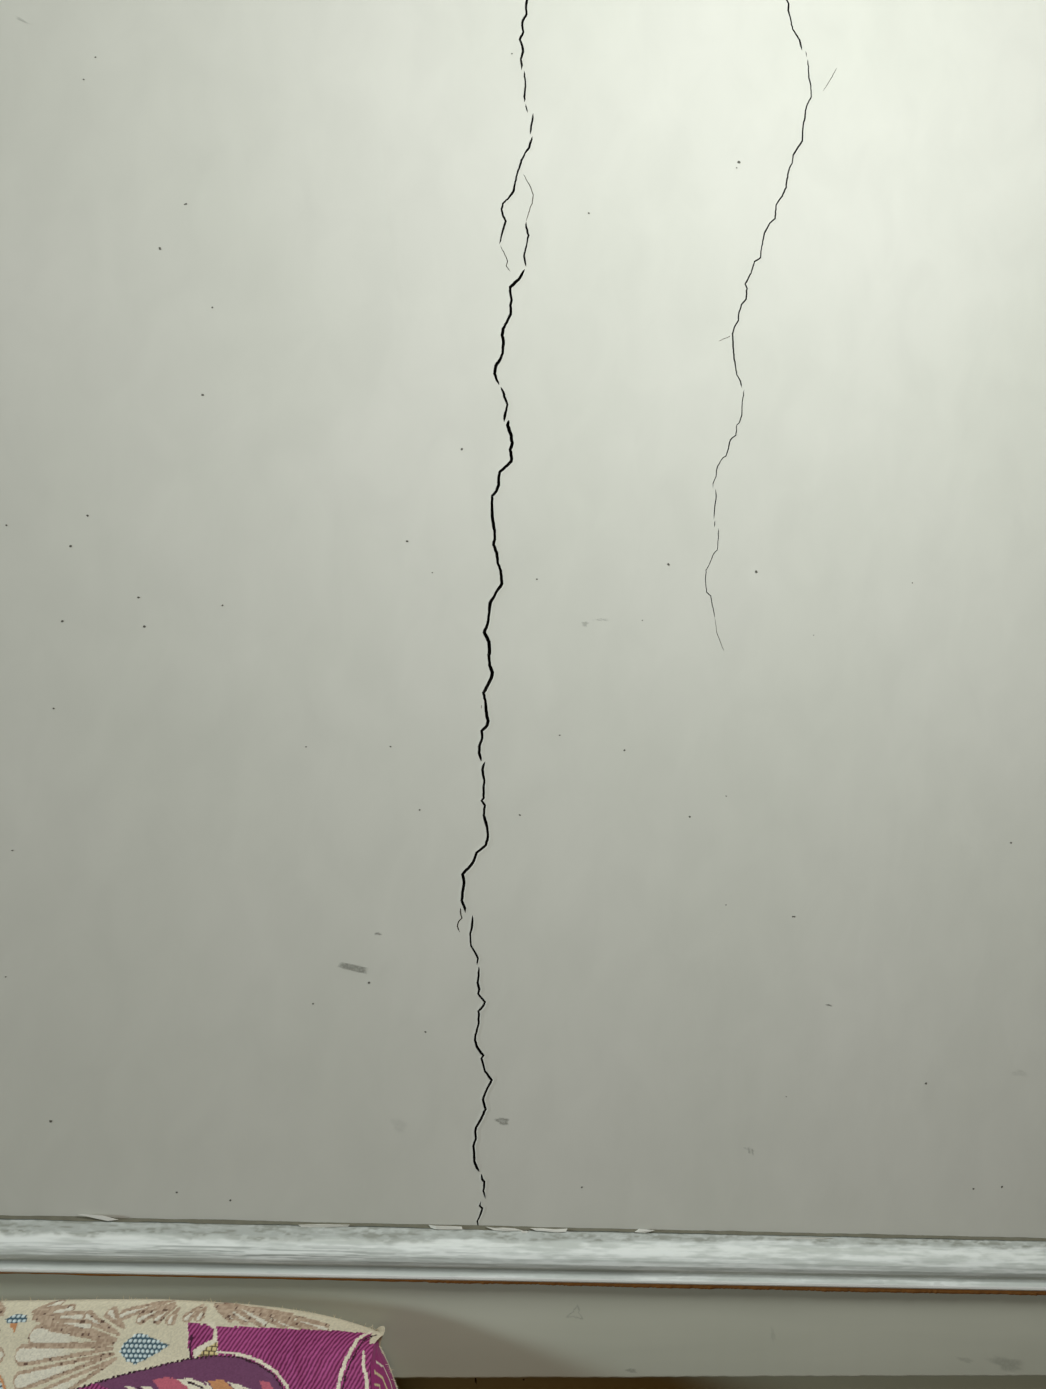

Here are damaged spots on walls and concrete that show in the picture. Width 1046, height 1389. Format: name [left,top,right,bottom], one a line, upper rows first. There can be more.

crack [457,0,537,1225]
crack [704,0,837,648]